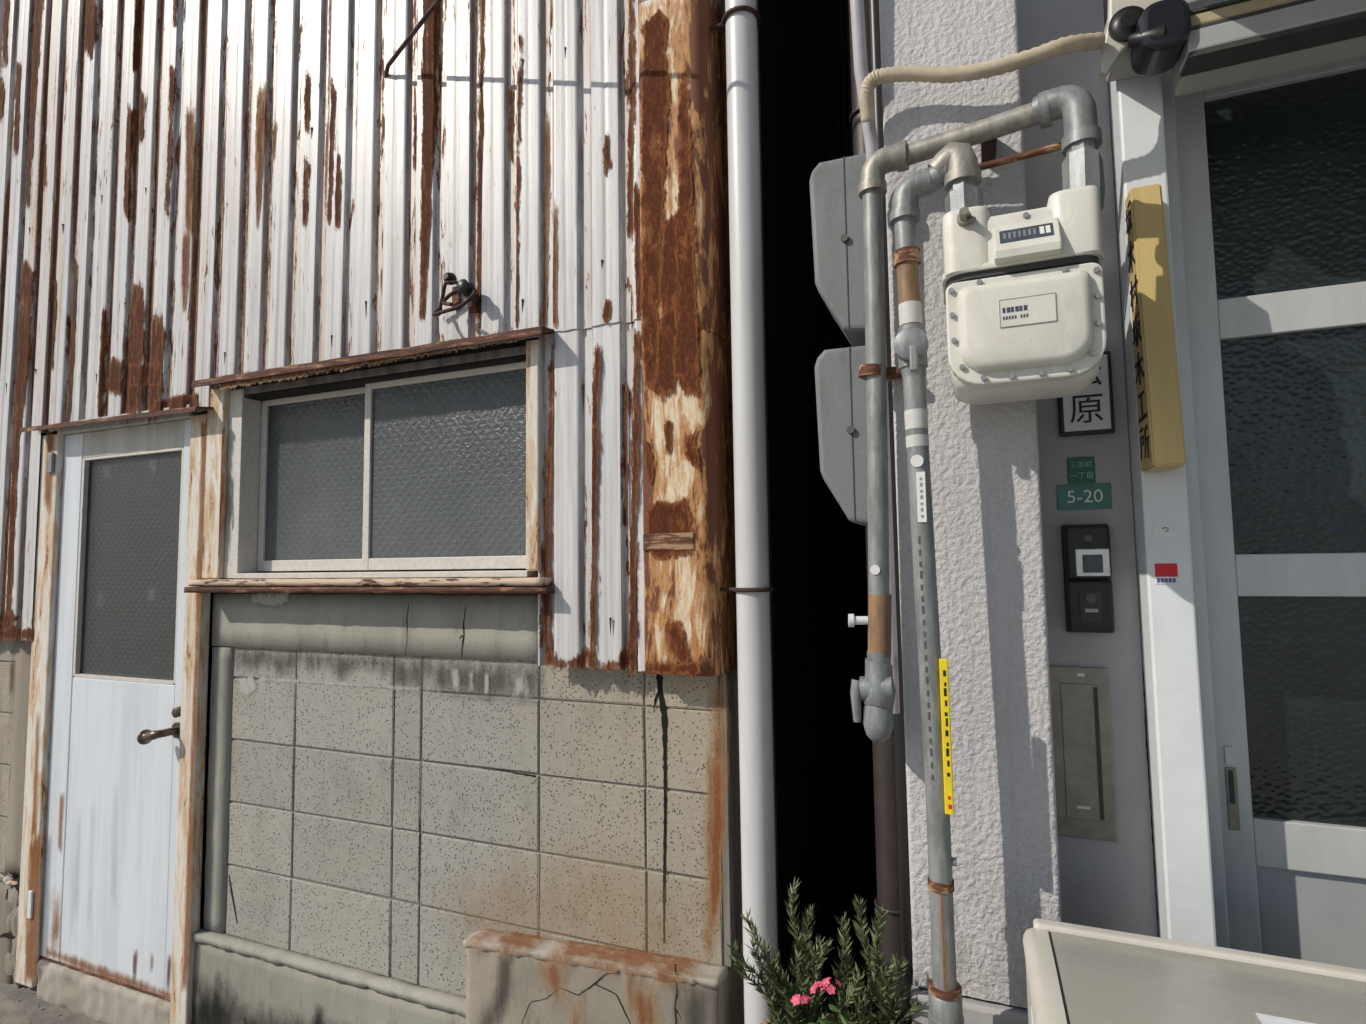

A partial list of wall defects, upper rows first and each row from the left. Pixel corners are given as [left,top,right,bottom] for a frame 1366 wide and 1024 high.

rust [0,0,48,209]
rust [84,0,99,60]
rust [123,0,147,223]
rust [164,64,199,310]
rust [0,260,37,642]
rust [220,0,702,679]
rust [25,258,226,999]
leakage [191,987,322,1024]
rust [471,928,542,954]
crack [522,973,631,1024]
rust [542,687,725,1024]
crack [653,674,681,1024]